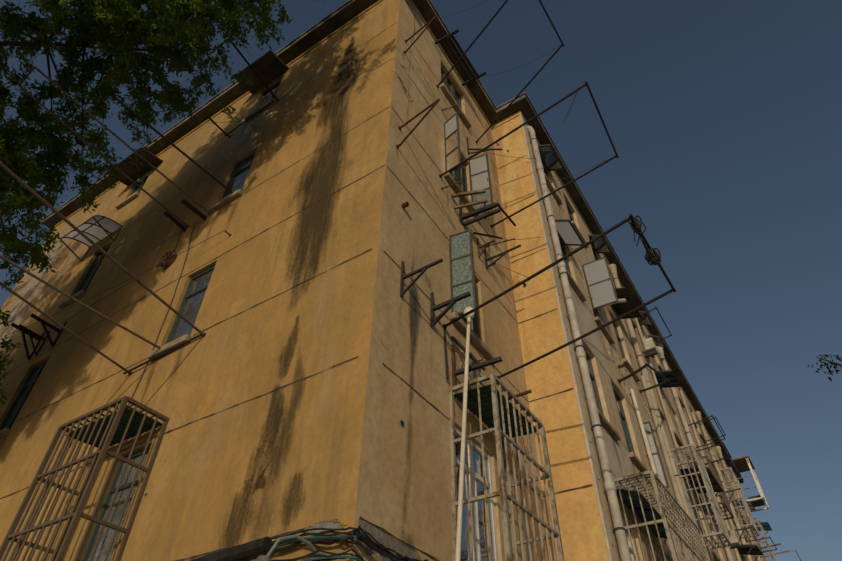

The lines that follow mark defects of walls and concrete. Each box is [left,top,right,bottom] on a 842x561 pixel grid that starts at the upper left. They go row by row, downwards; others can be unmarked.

leakage [289,37,358,300]
leakage [222,316,303,549]
leakage [409,283,419,396]